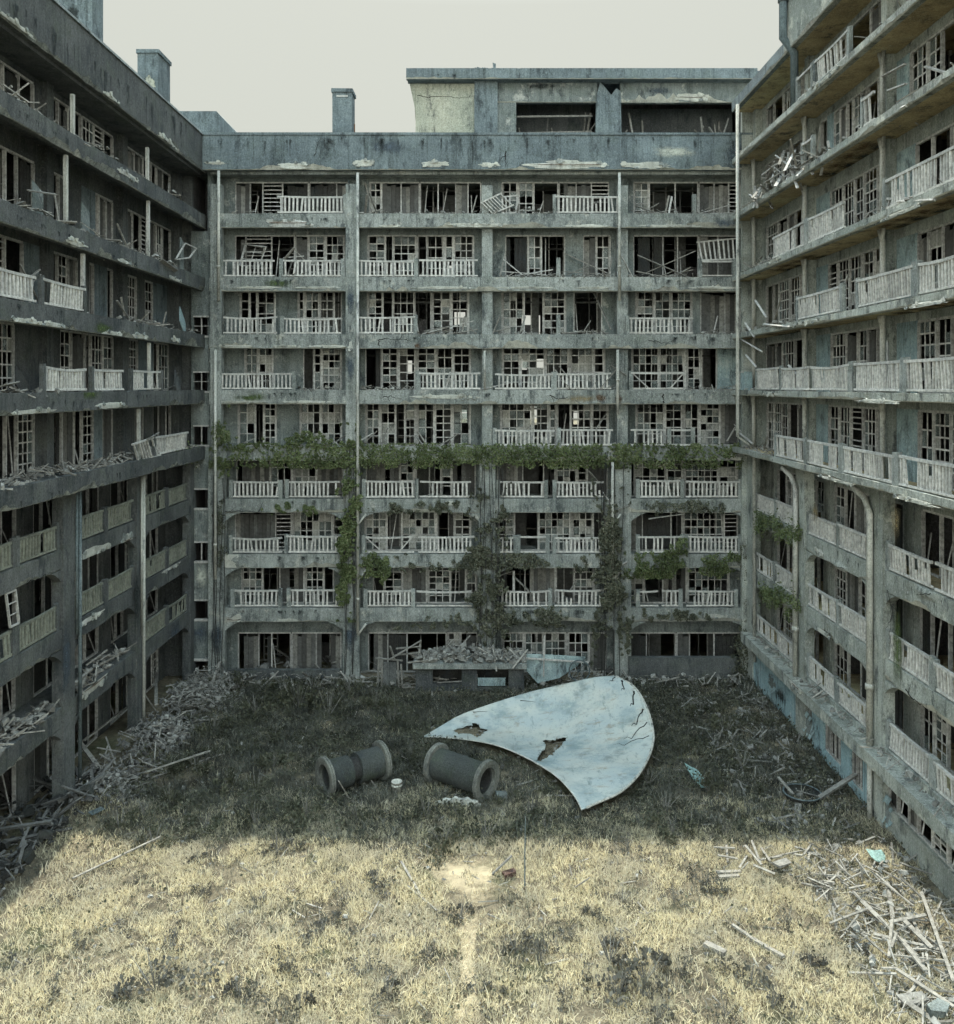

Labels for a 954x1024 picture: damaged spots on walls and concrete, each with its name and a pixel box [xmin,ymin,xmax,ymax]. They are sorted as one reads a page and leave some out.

spalling [674,92,710,102]
spalling [278,161,311,169]
spalling [522,158,608,169]